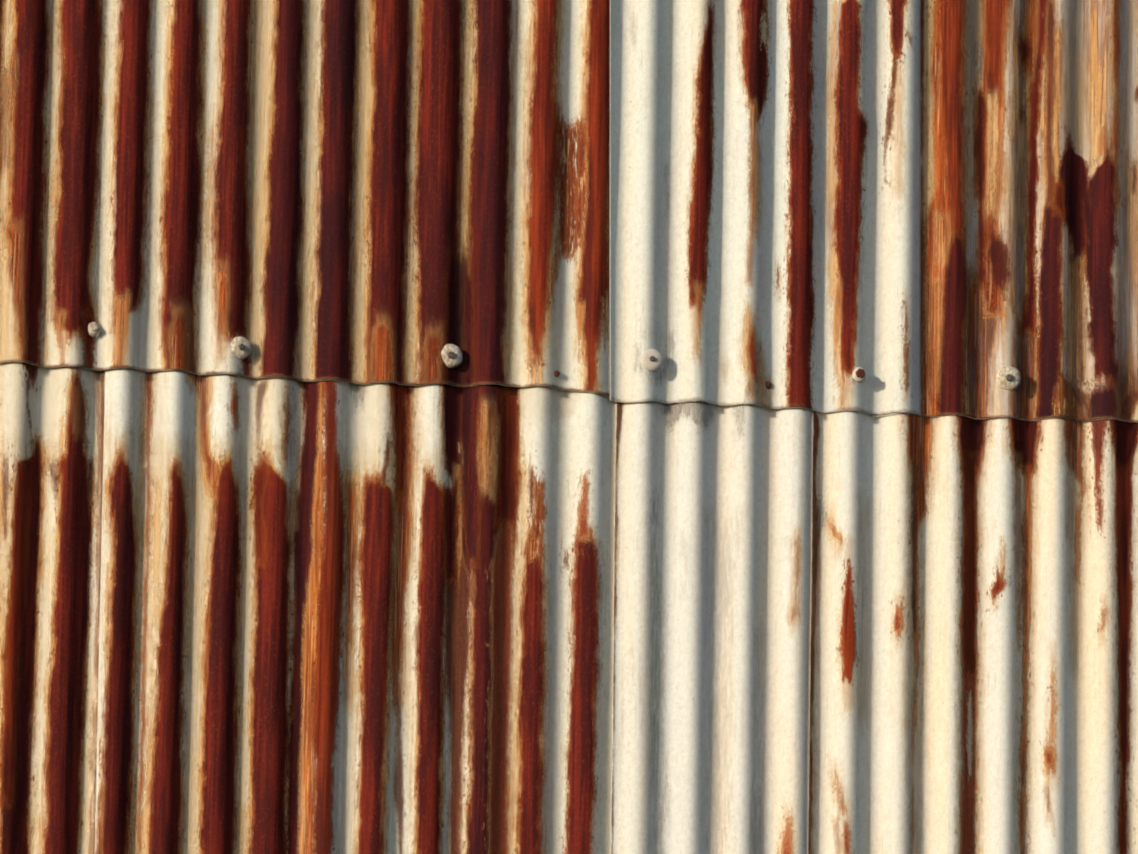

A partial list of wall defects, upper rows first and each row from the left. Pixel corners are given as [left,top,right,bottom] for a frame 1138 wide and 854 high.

rust [0,0,623,854]
rust [686,6,715,347]
rust [739,0,769,281]
rust [743,307,768,407]
rust [777,0,842,854]
rust [832,0,867,382]
rust [883,0,1138,854]
rust [837,556,858,686]
rust [835,773,850,854]